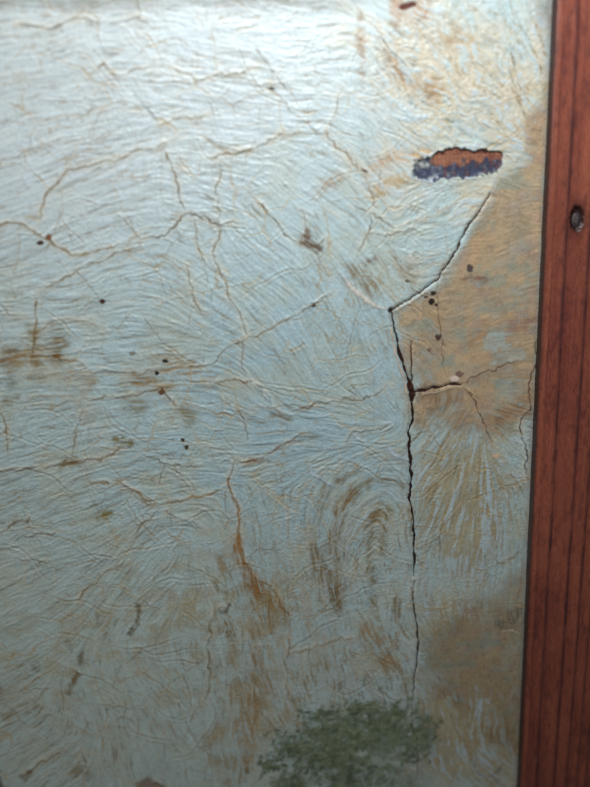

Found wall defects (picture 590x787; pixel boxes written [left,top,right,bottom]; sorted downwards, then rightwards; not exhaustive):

peeling [413,147,502,183]
crack [390,193,513,697]